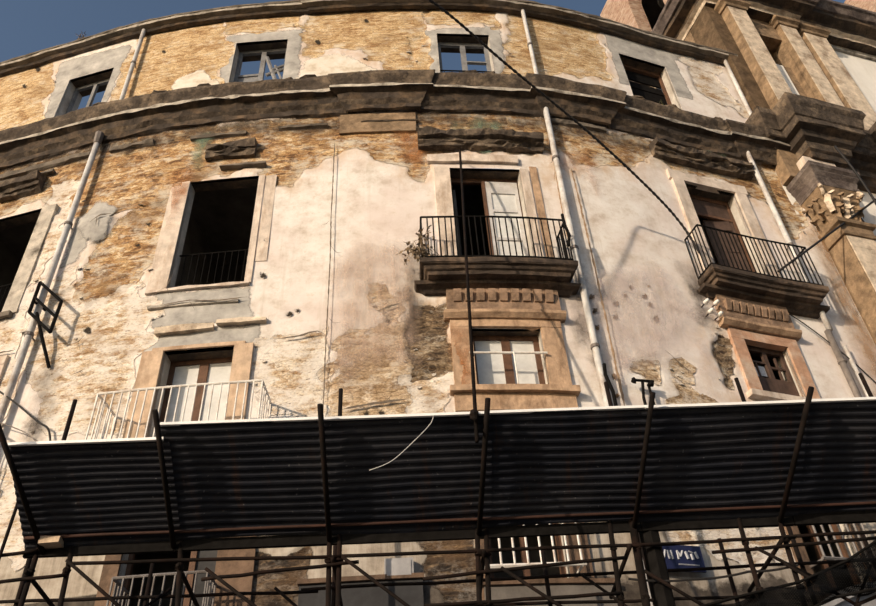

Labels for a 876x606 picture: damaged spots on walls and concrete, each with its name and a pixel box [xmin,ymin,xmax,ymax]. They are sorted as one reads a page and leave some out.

flaking render [0,63,55,131]
flaking render [111,9,614,101]
peeling [678,56,749,118]
flaking render [664,161,809,240]
flaking render [0,110,652,436]
peeling [630,358,718,405]
flaking render [712,326,735,390]
flaking render [251,547,313,606]